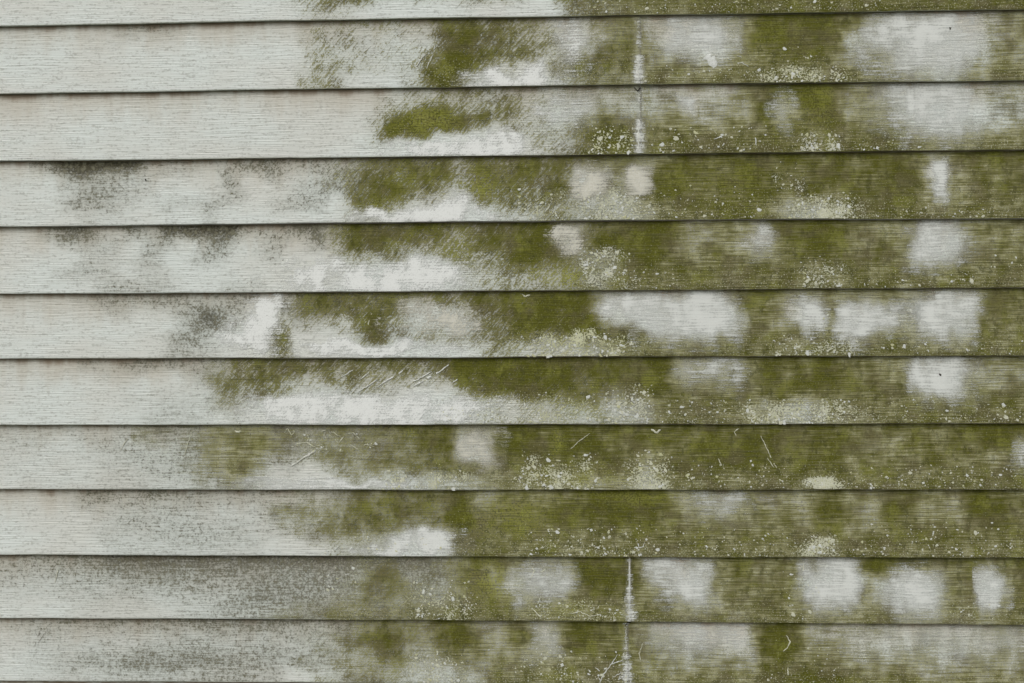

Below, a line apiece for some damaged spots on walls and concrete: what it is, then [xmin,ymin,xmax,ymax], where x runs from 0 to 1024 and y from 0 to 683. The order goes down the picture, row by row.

mould [205,158,433,211]
mould [45,227,106,247]
mould [123,224,343,265]
mould [0,412,457,681]